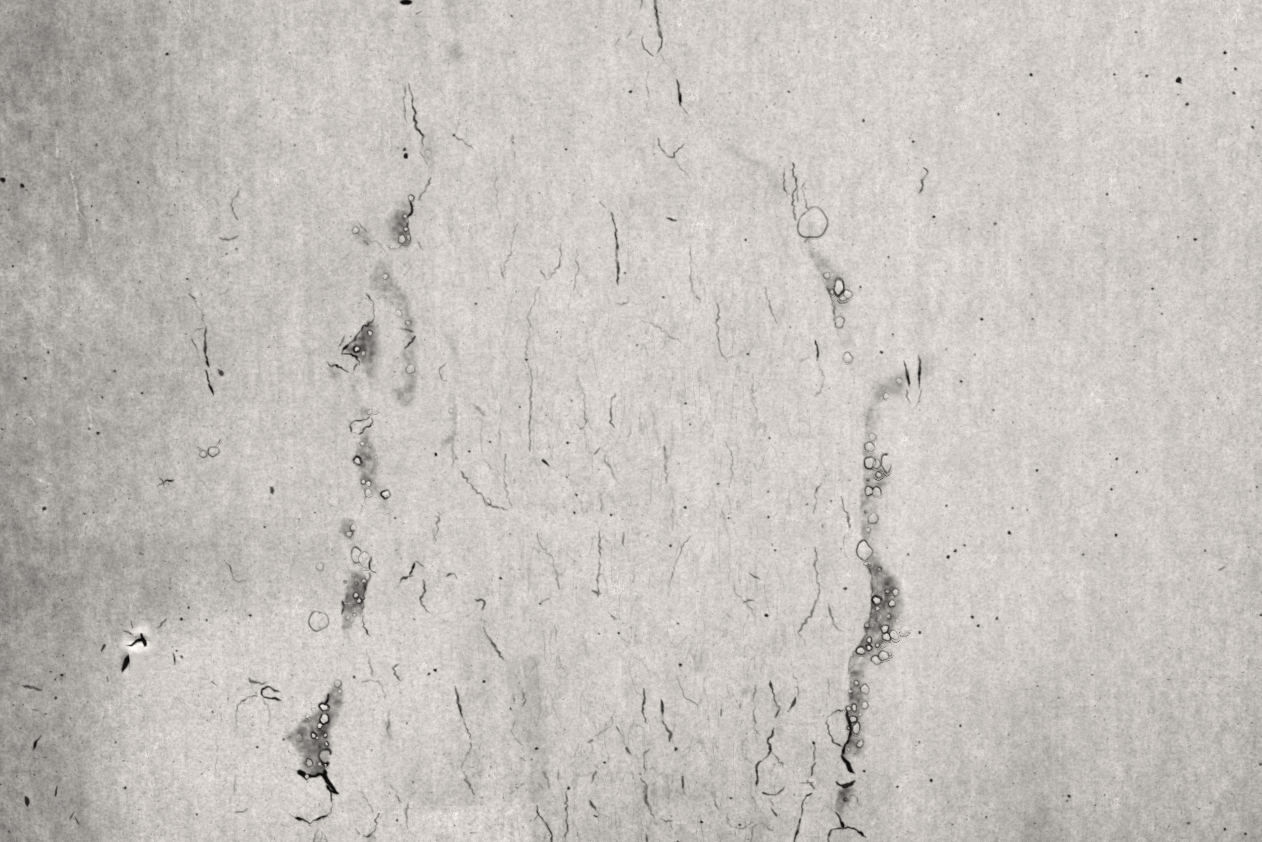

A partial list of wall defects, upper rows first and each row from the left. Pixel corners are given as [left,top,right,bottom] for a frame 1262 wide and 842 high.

leakage [810,254,858,365]
leakage [337,193,424,647]
leakage [437,330,462,471]
leakage [824,348,939,786]
leakage [282,677,348,825]